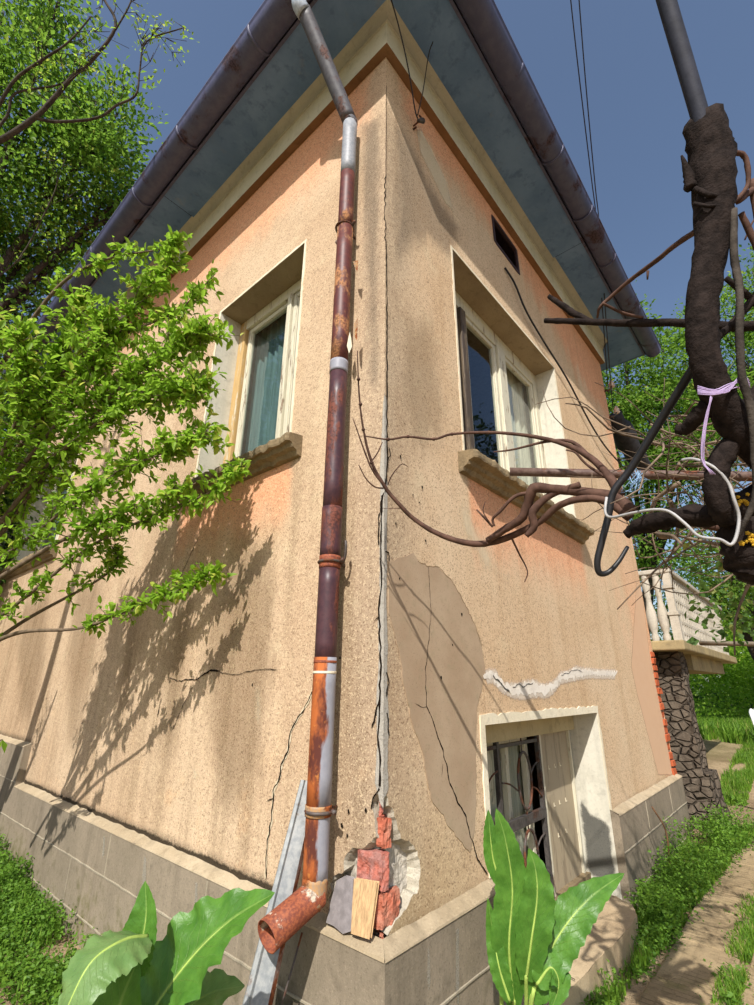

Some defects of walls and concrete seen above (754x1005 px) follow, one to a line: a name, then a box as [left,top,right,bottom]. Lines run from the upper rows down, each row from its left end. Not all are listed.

crack [371,176,391,808]
crack [157,669,277,728]
spalling [329,393,421,939]
crack [493,675,533,692]
crack [264,692,312,879]
corrosion [292,837,305,894]
corrosion [268,944,285,1005]